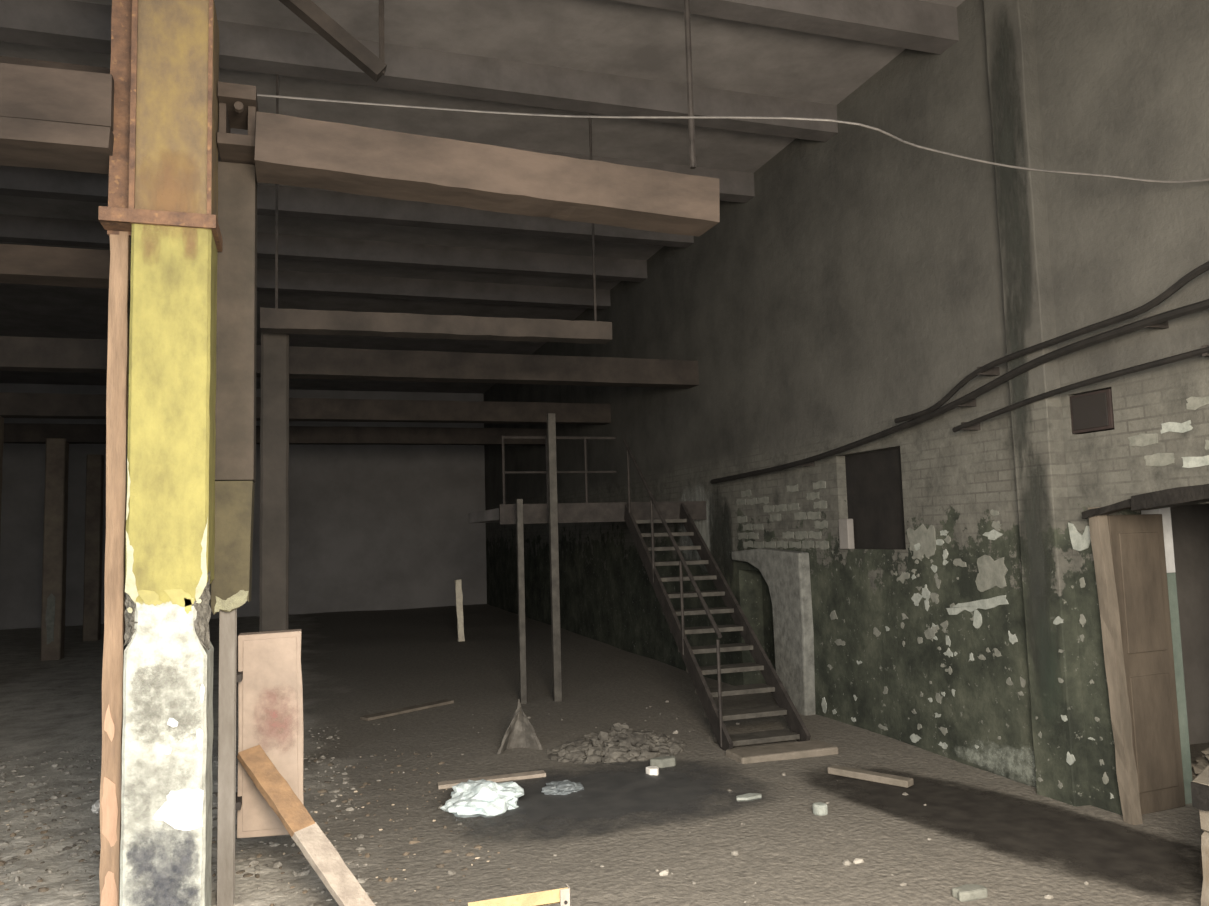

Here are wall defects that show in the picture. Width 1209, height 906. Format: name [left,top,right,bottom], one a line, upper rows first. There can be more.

leakage [993,20,1030,450]
flaking render [1128,396,1209,468]
flaking render [983,509,1003,540]
peeling [1068,522,1091,551]
leakage [1021,464,1058,690]
flaking render [873,524,1018,749]
peeling [1006,677,1026,696]
leakage [958,742,1036,781]
flaking render [153,788,204,831]
leakage [128,847,152,874]
leakage [154,841,196,906]